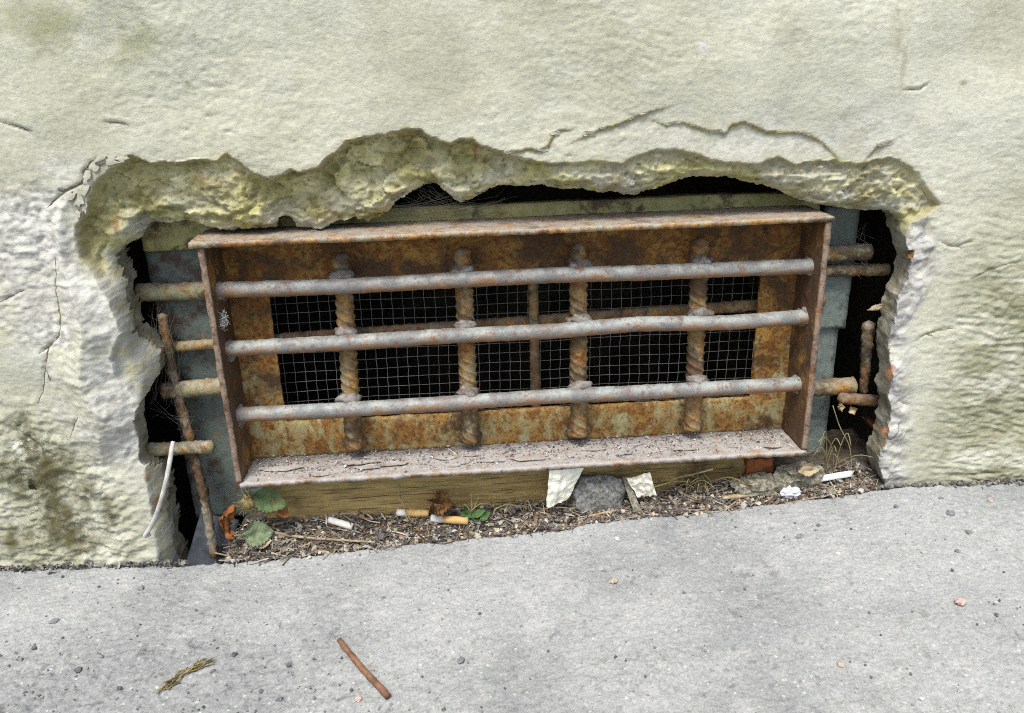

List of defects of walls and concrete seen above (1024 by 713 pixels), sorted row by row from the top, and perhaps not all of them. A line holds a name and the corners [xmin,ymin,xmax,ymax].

spalling [66,108,941,316]
crack [37,258,61,403]
leakage [5,435,85,552]
spalling [145,455,189,567]
peeling [341,460,408,469]